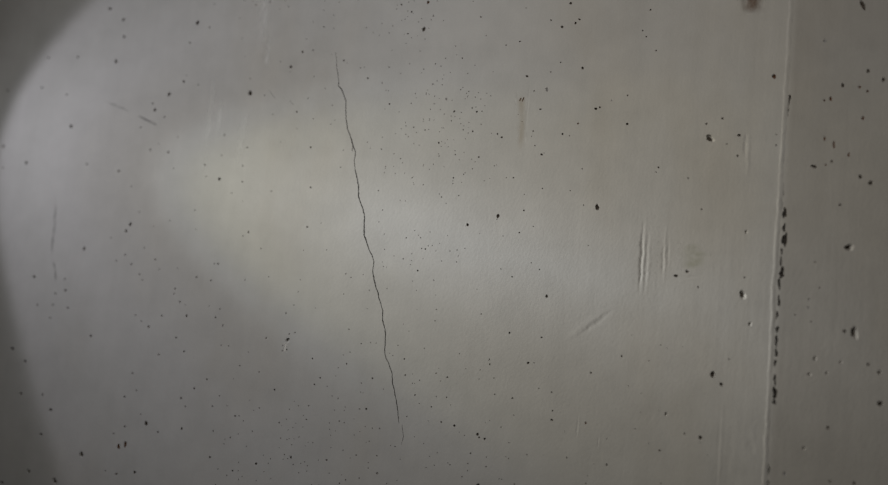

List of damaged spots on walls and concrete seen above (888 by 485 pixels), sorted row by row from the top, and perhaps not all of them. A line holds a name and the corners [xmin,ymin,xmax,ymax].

crack [335,52,404,444]